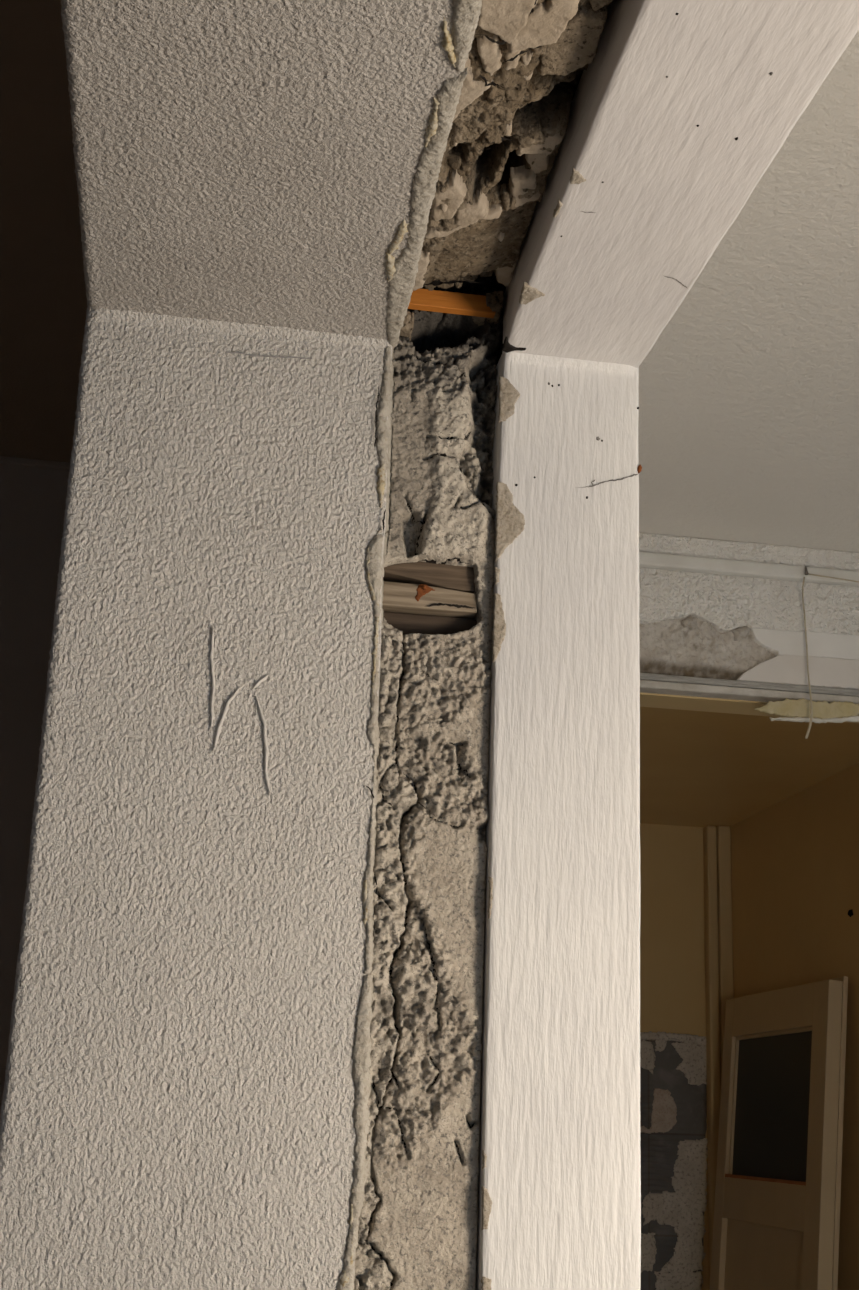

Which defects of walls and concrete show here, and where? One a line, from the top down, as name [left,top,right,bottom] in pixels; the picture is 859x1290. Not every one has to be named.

crack [355,642,460,1286]
spalling [336,0,613,1290]
flaking render [640,1031,708,1290]
flaking render [639,615,775,680]